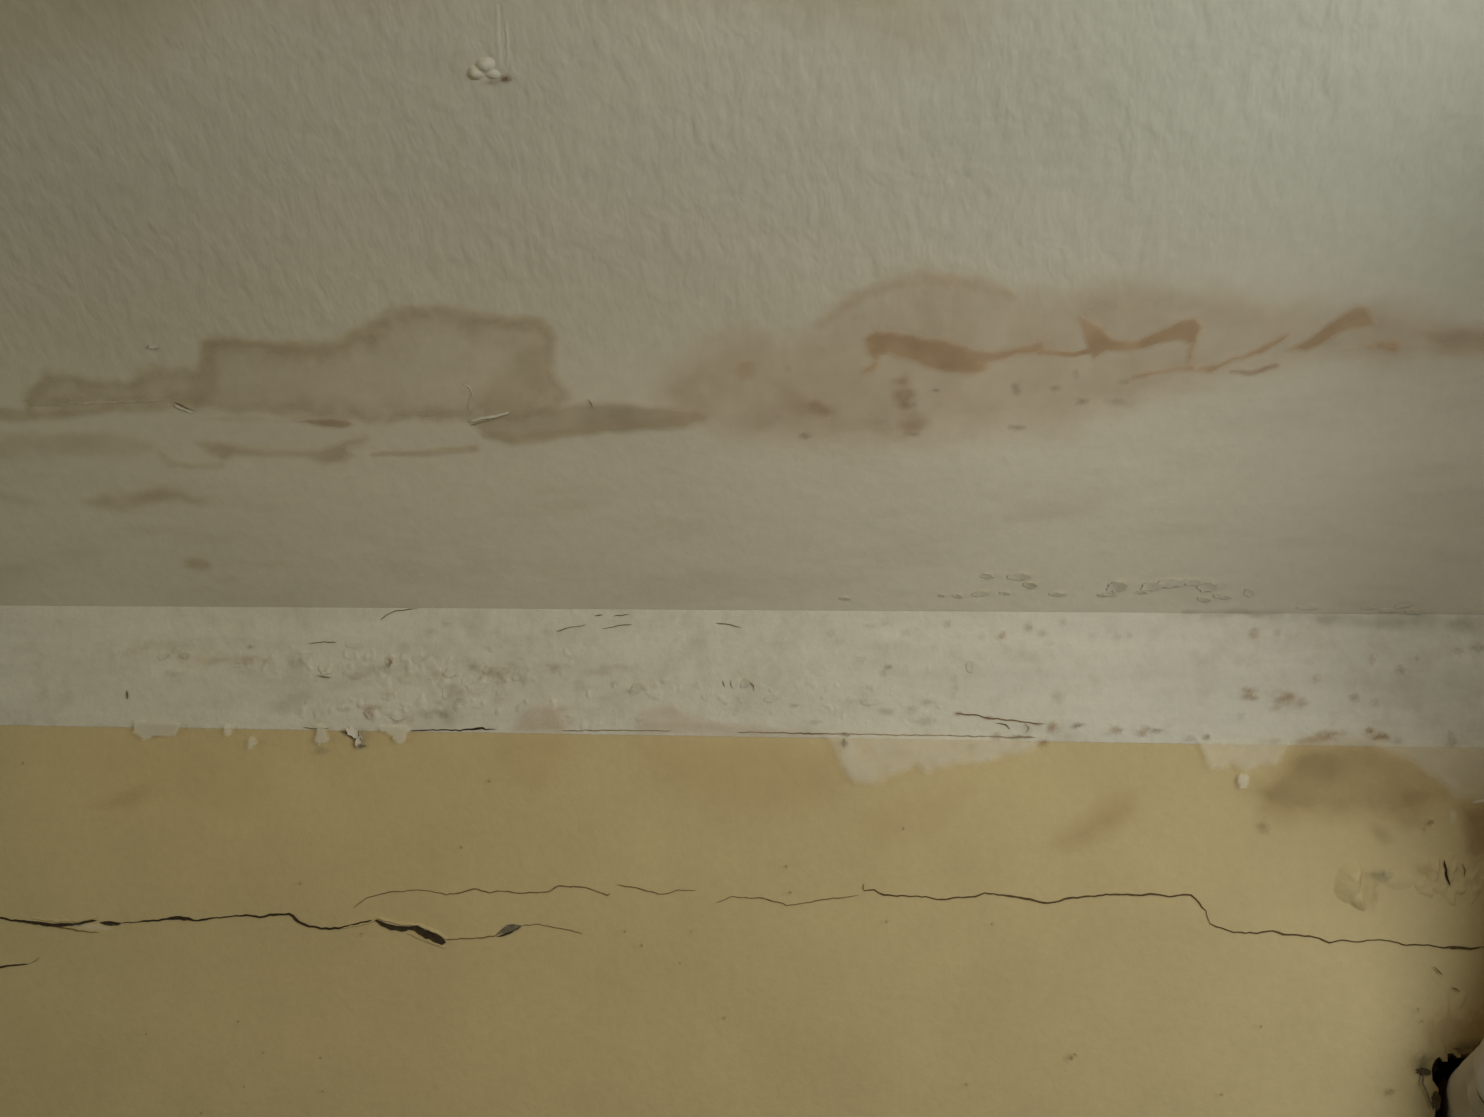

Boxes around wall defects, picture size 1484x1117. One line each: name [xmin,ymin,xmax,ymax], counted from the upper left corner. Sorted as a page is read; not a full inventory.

damp [868,320,1201,372]
damp [1300,309,1371,349]
damp [581,406,695,432]
peeling [316,725,366,748]
damp [1267,751,1429,808]
crack [0,885,1484,950]
spalling [1412,966,1484,1117]